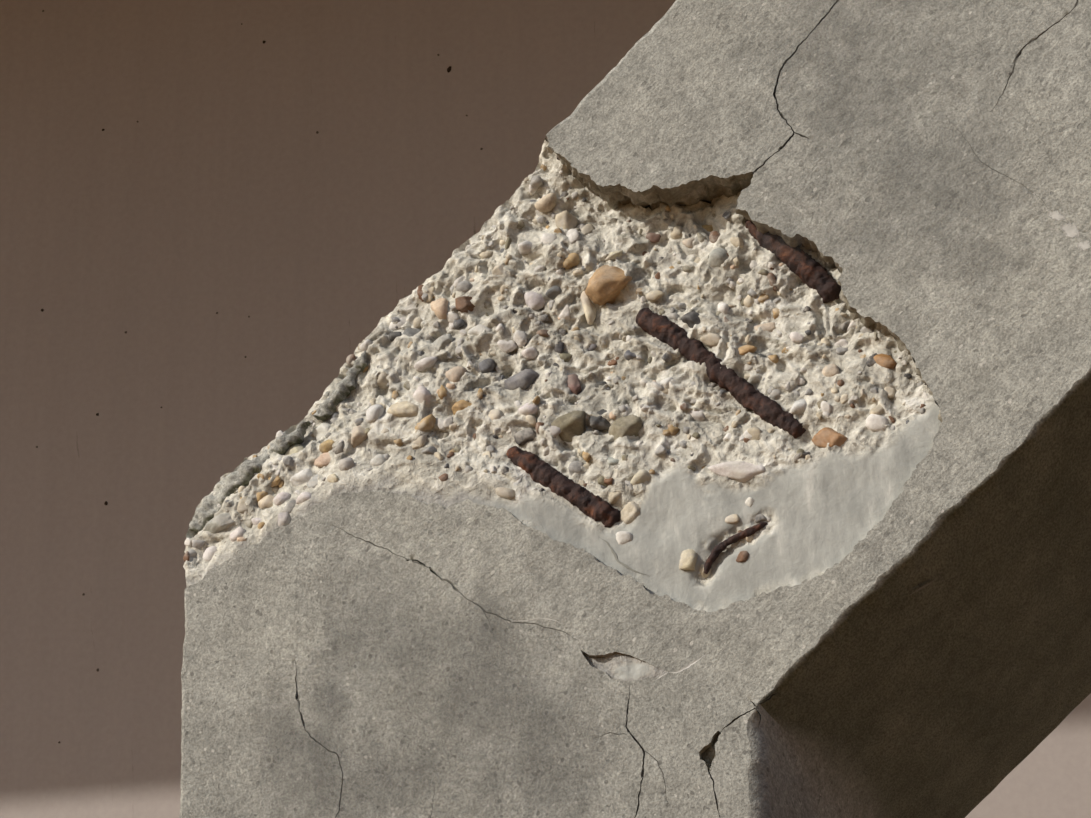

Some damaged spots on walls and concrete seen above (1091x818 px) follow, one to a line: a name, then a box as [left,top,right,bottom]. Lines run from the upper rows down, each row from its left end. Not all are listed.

crack [752,0,839,174]
crack [993,0,1079,109]
spalling [183,138,942,612]
crack [337,527,585,650]
crack [599,537,649,576]
crack [295,662,343,818]
crack [599,686,667,818]
crack [657,654,707,679]
crack [708,769,720,817]
crack [718,692,778,736]